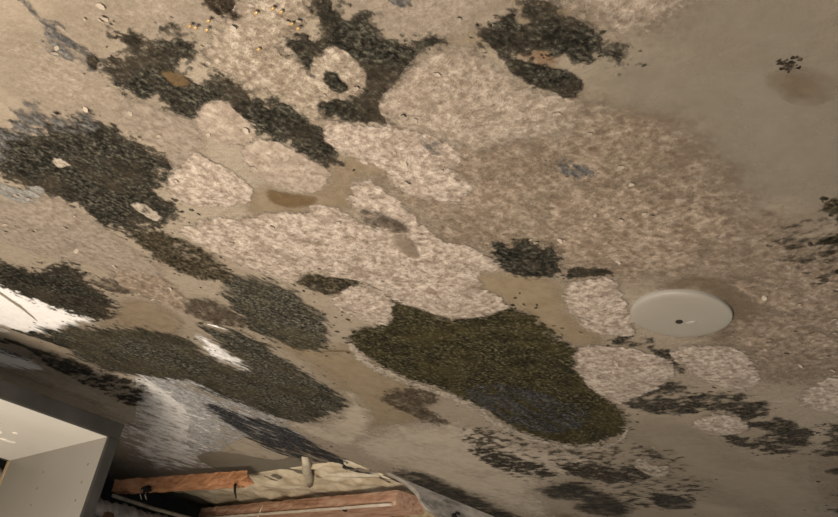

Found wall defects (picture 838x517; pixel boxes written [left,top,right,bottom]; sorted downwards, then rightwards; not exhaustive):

peeling [197,336,254,374]
damp [0,109,838,517]
flaking render [367,104,838,378]